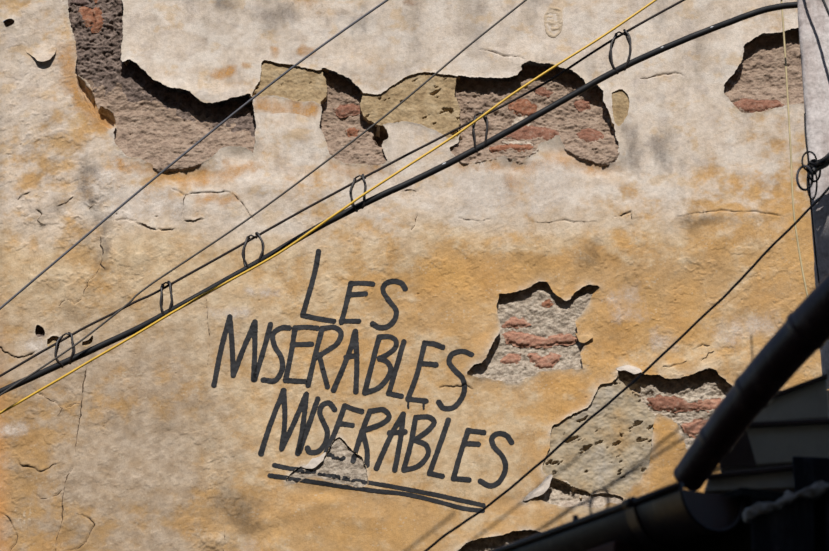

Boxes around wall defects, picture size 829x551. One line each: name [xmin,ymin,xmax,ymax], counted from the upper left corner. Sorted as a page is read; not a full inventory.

peeling [26,44,56,62]
spalling [68,0,629,173]
spalling [724,28,804,113]
crack [114,189,253,231]
crack [59,236,105,306]
spalling [467,281,600,383]
spalling [286,437,368,487]
spalling [523,365,733,508]
spalling [458,530,540,551]